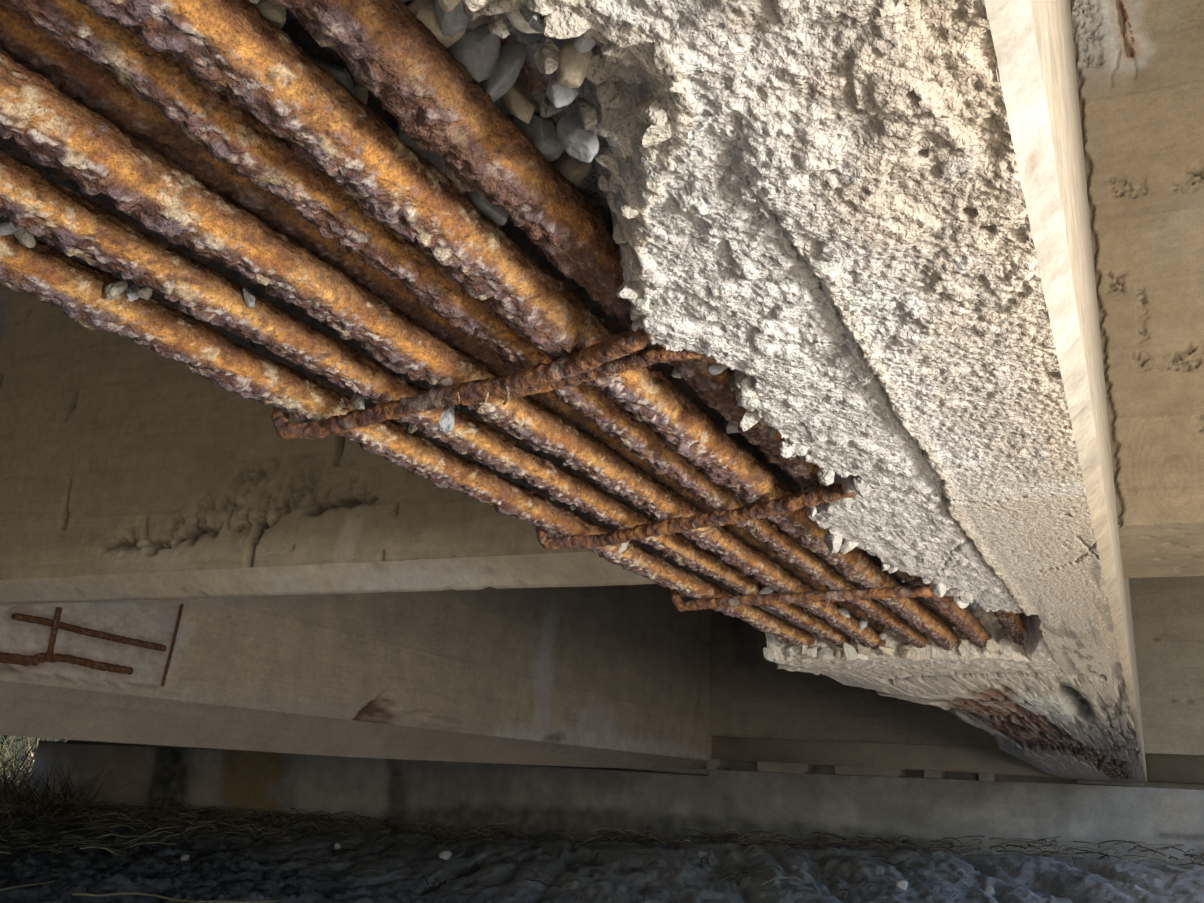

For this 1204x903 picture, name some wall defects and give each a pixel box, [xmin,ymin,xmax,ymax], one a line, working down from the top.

corrosion [1100,0,1164,81]
spalling [0,0,1044,663]
spalling [0,599,200,695]
spalling [901,681,1136,781]